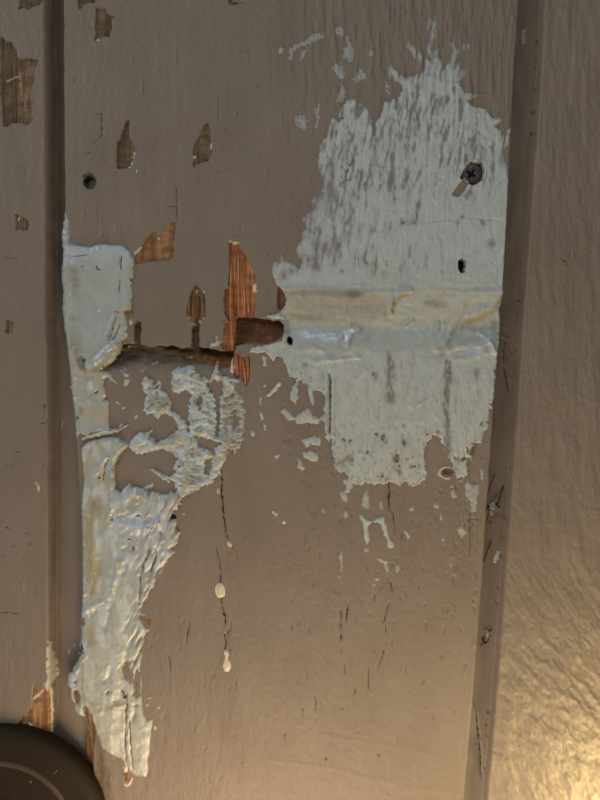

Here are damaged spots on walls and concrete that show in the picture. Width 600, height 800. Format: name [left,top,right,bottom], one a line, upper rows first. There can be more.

peeling [78,0,114,41]
peeling [0,37,38,127]
peeling [277,26,367,103]
peeling [117,120,137,173]
peeling [134,222,176,264]
peeling [277,287,286,310]
peeling [281,408,327,424]
peeling [297,436,322,471]
peeling [438,466,484,512]
crack [216,469,238,649]
peeling [19,683,54,733]
peeling [85,711,96,770]